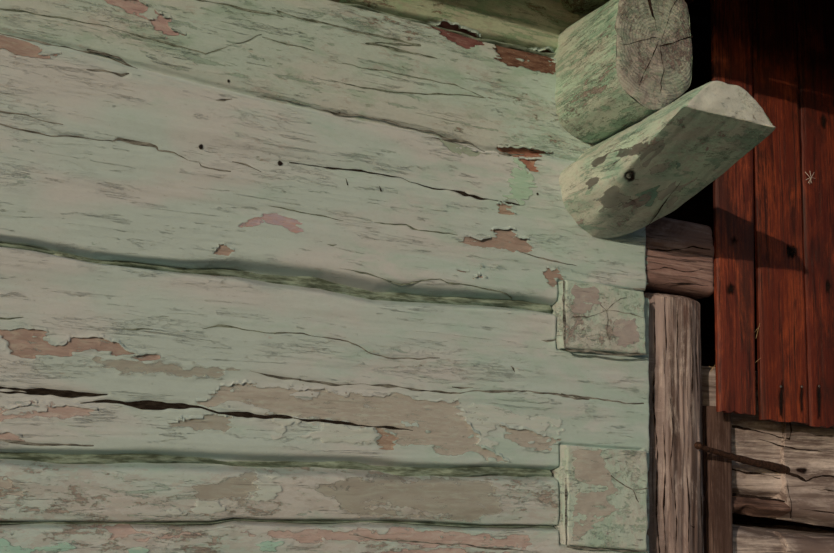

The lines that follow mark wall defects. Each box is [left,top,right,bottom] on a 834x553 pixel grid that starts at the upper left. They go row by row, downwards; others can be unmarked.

peeling [0,33,61,59]
crack [0,33,138,77]
crack [198,0,437,59]
peeling [428,19,556,74]
crack [0,111,261,172]
crack [265,96,537,156]
peeling [440,138,553,174]
peeling [459,226,533,253]
crack [0,386,413,431]
peeling [0,325,565,462]
peeling [167,467,282,515]
crack [732,460,834,518]